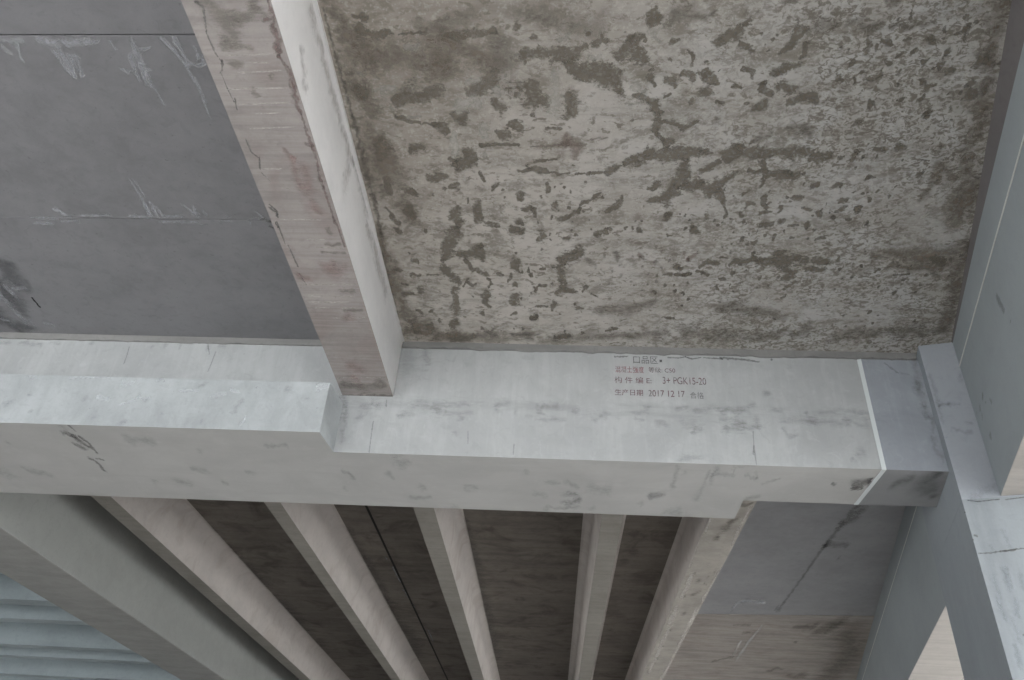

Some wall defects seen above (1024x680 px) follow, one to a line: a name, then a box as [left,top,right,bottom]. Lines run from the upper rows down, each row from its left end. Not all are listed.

water stain [331,6,845,341]
water stain [835,0,1012,225]
water stain [834,239,970,339]